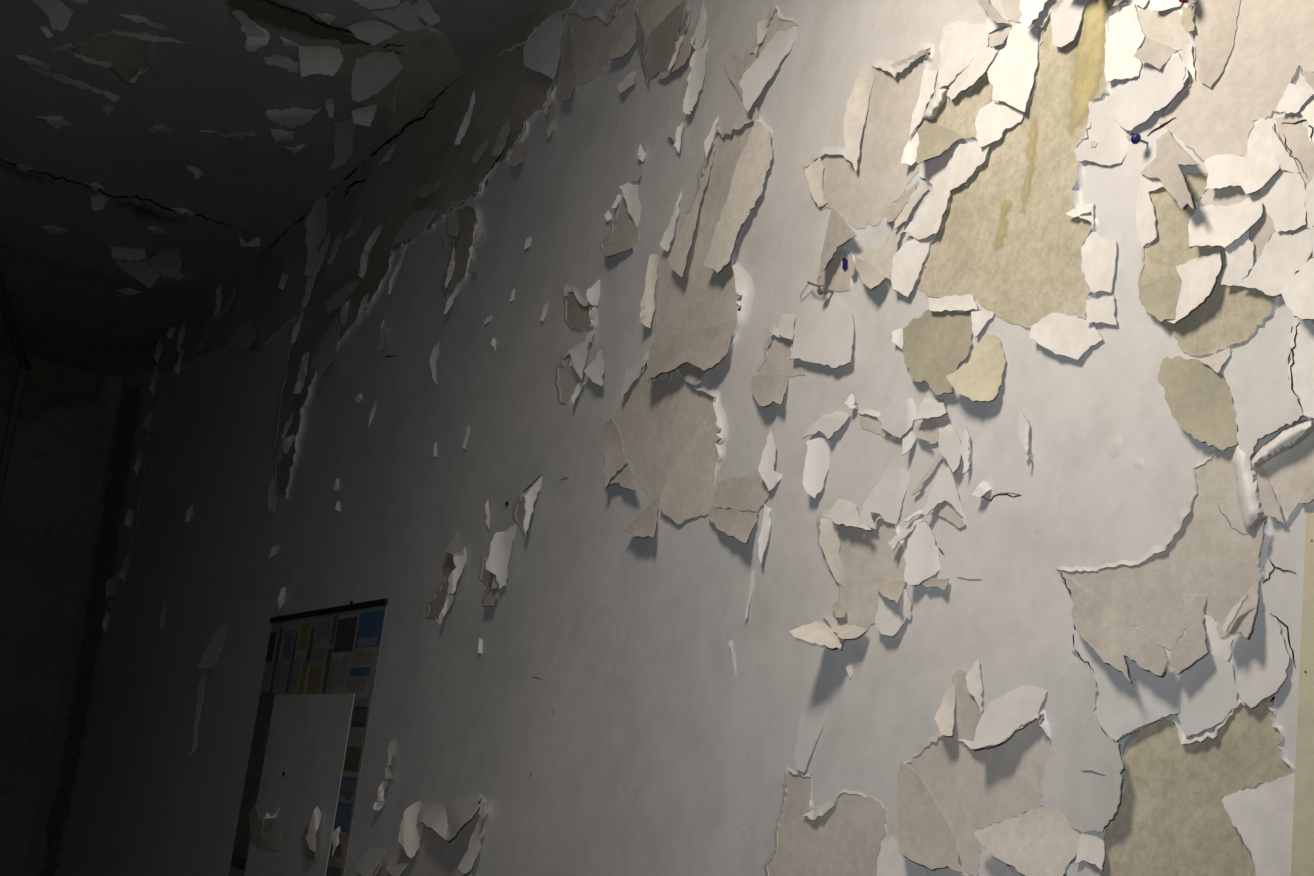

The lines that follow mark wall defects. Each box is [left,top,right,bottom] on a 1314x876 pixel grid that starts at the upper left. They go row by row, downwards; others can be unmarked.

peeling [32,0,88,38]
crack [257,0,407,54]
peeling [16,55,120,116]
crack [0,79,457,266]
peeling [110,246,204,295]
peeling [137,0,798,564]
peeling [750,0,1314,876]
peeling [425,476,542,625]
peeling [373,739,394,810]
peeling [354,793,488,876]